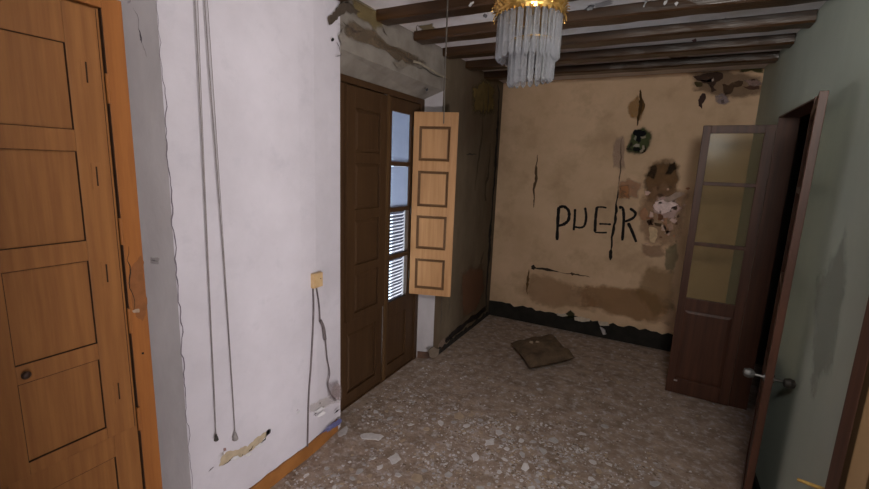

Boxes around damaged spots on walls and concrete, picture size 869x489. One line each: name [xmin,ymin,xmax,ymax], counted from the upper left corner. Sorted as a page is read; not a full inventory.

flaking render [328,0,424,68]
flaking render [693,68,763,108]
crack [531,155,539,208]
flaking render [619,160,690,245]
flaking render [210,429,271,470]